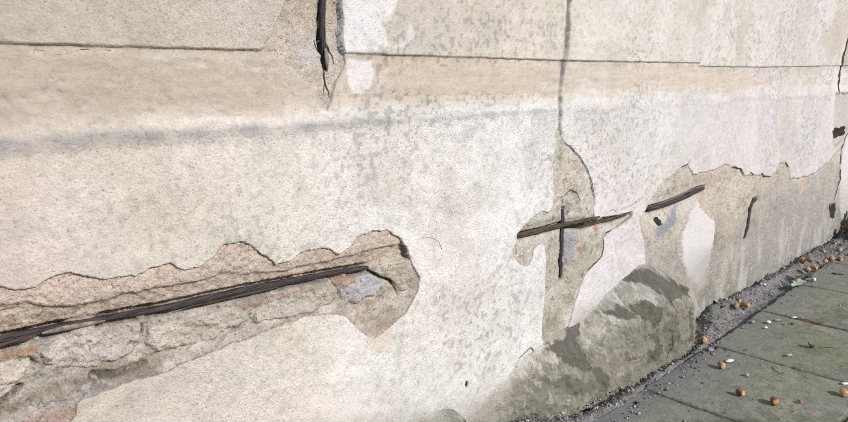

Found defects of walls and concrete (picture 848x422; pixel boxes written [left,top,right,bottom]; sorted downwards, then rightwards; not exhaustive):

peeling [0,0,344,132]
crack [838,40,848,93]
spalling [0,230,419,422]
spalling [513,129,629,339]
peeling [639,93,848,312]